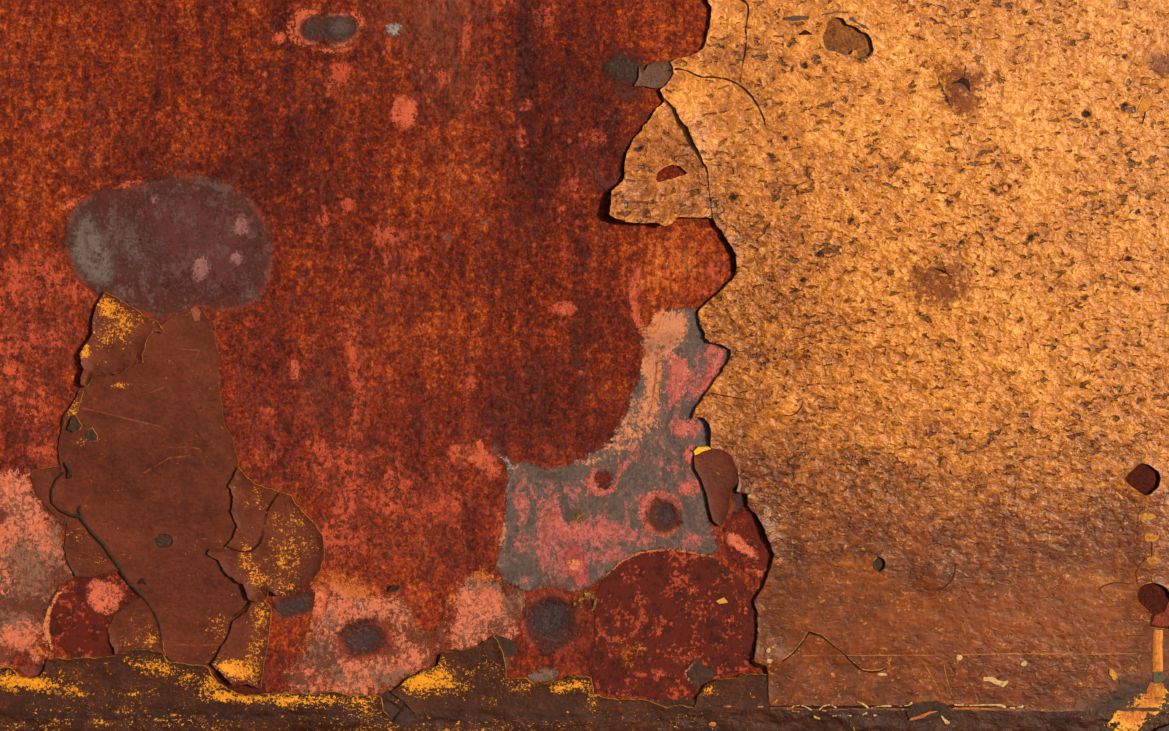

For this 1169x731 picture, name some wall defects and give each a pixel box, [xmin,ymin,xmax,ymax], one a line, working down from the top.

crack [670,0,767,130]
corrosion [0,0,774,700]
peeling [383,0,1169,731]
peeling [0,291,730,722]
crack [704,700,912,731]
crack [752,630,886,673]
crack [948,703,1025,711]